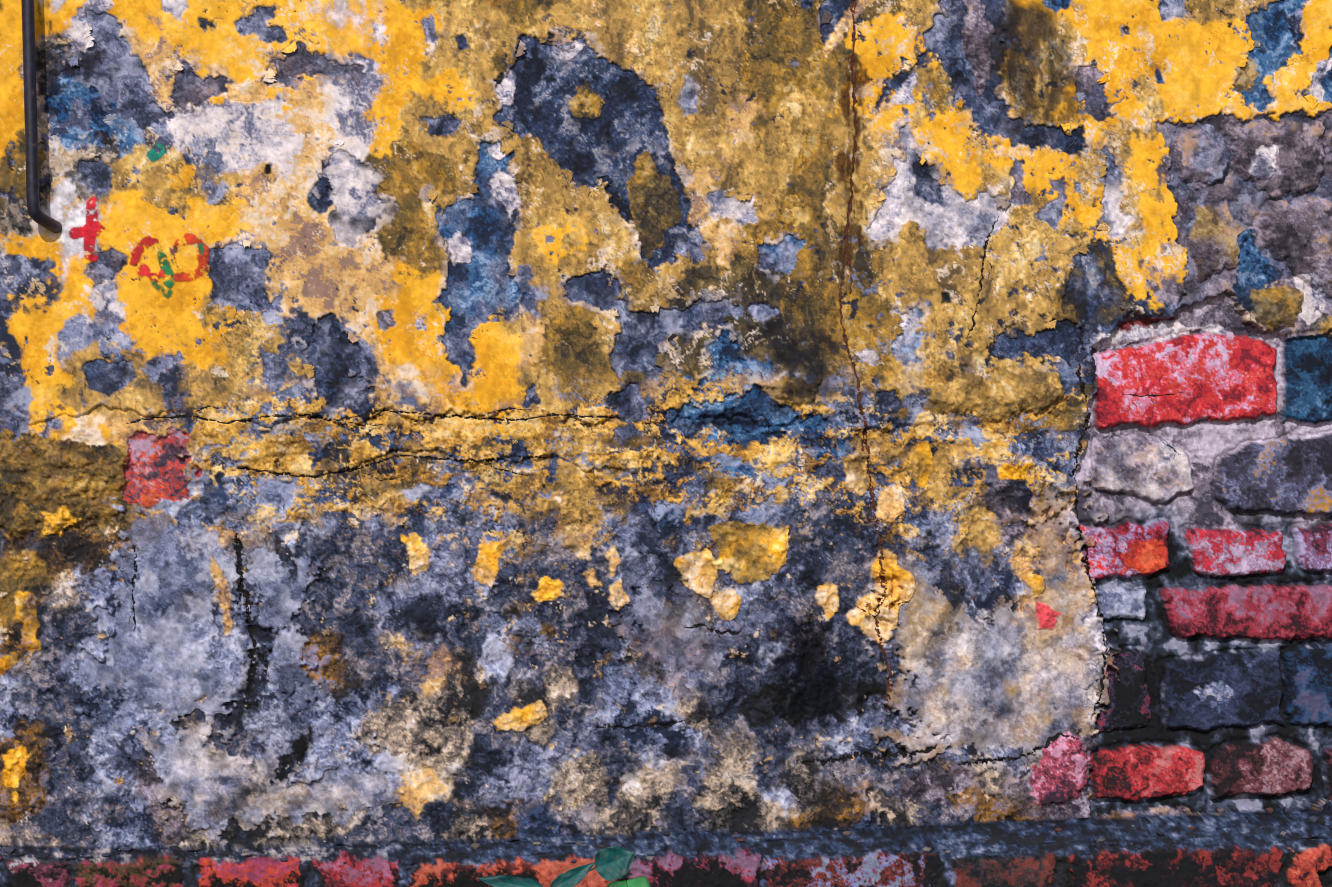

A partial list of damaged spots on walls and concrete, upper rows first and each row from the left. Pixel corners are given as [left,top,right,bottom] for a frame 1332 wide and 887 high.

peeling [45,6,366,135]
peeling [425,34,704,386]
rust [836,53,870,265]
peeling [867,0,1110,251]
crack [234,531,269,699]
crack [126,405,624,427]
crack [237,454,553,481]
peeling [675,522,788,620]
peeling [816,551,915,643]
crack [838,0,910,717]
crack [796,321,1108,780]
spalling [985,147,1332,815]